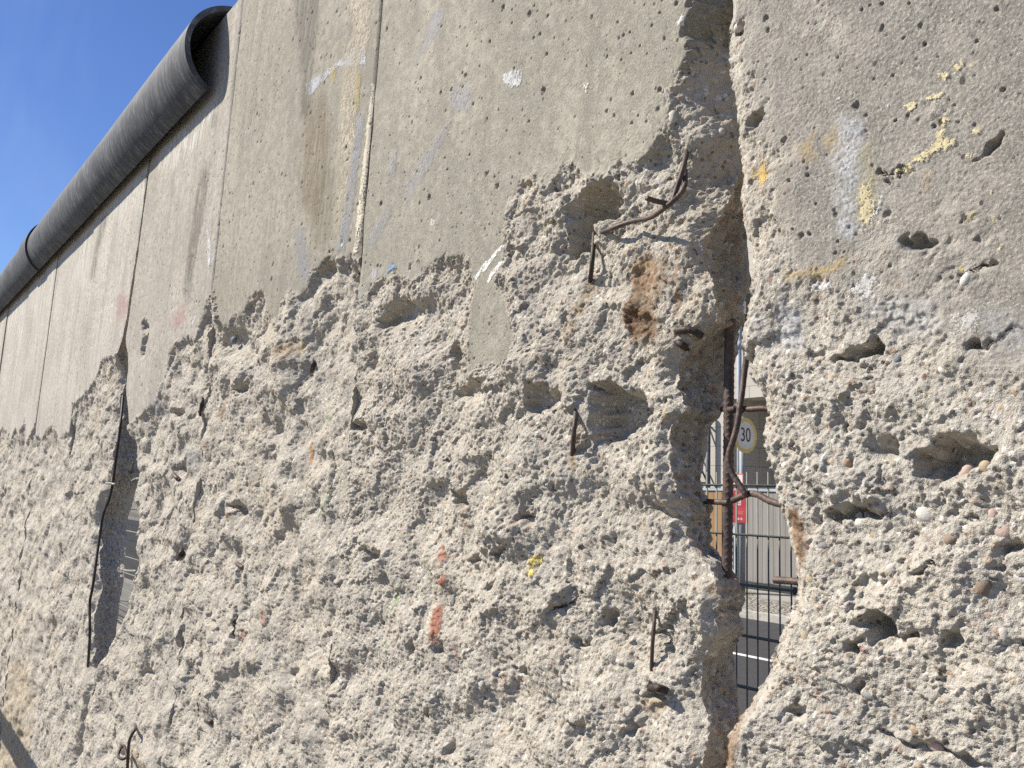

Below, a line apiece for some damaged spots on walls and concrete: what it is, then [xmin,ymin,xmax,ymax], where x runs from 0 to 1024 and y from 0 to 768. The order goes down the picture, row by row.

spalling [0,0,743,768]
rust [623,256,678,338]